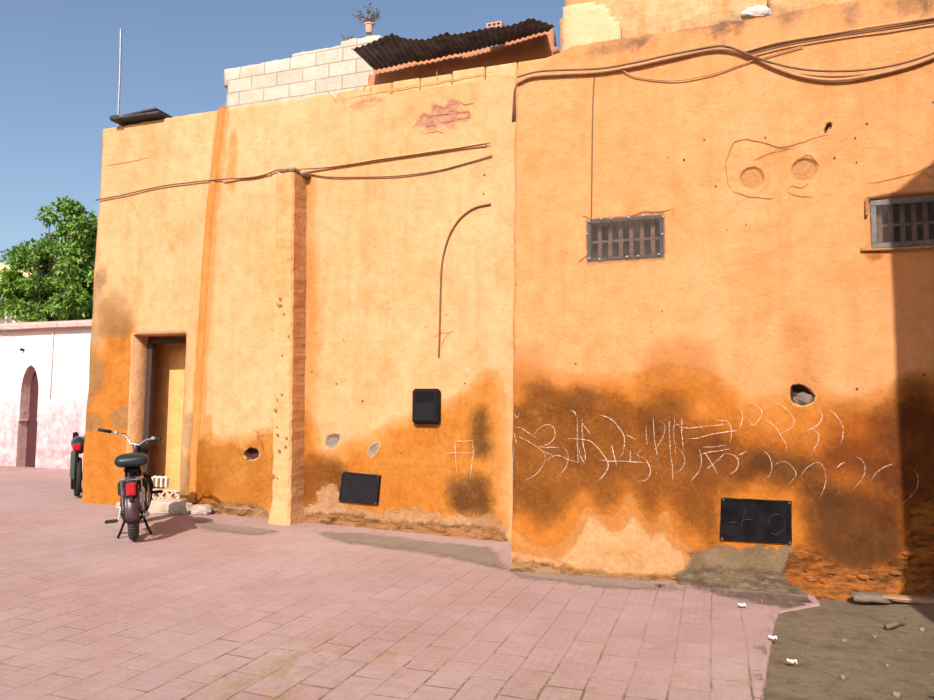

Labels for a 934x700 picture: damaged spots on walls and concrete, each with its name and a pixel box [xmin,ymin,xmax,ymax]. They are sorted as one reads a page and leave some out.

spalling [412,94,476,138]
leakage [83,317,130,505]
leakage [304,382,934,579]
spalling [304,511,507,542]
spalling [510,524,934,604]